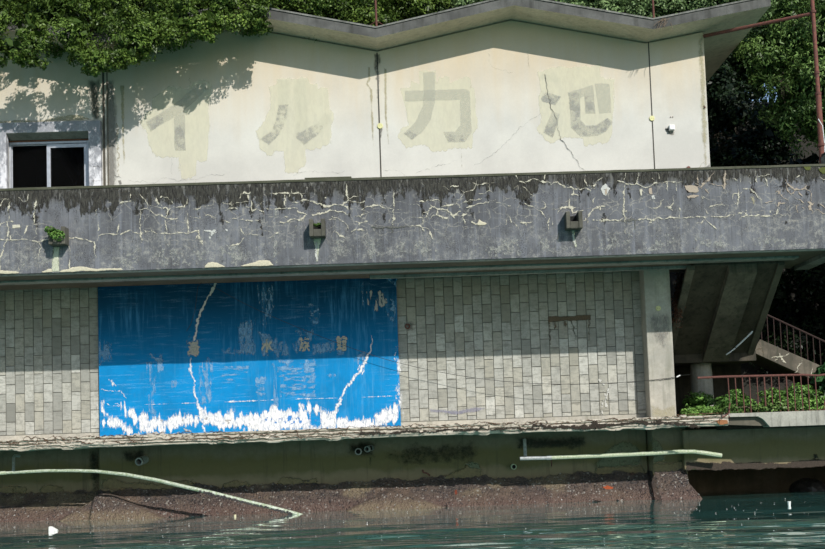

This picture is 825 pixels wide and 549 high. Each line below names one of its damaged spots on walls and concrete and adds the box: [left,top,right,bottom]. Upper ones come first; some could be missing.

damp [367,55,387,138]
crack [0,196,48,268]
damp [23,247,59,271]
damp [0,82,825,236]
crack [68,76,825,269]
spalling [685,185,699,198]
peeling [97,286,402,436]